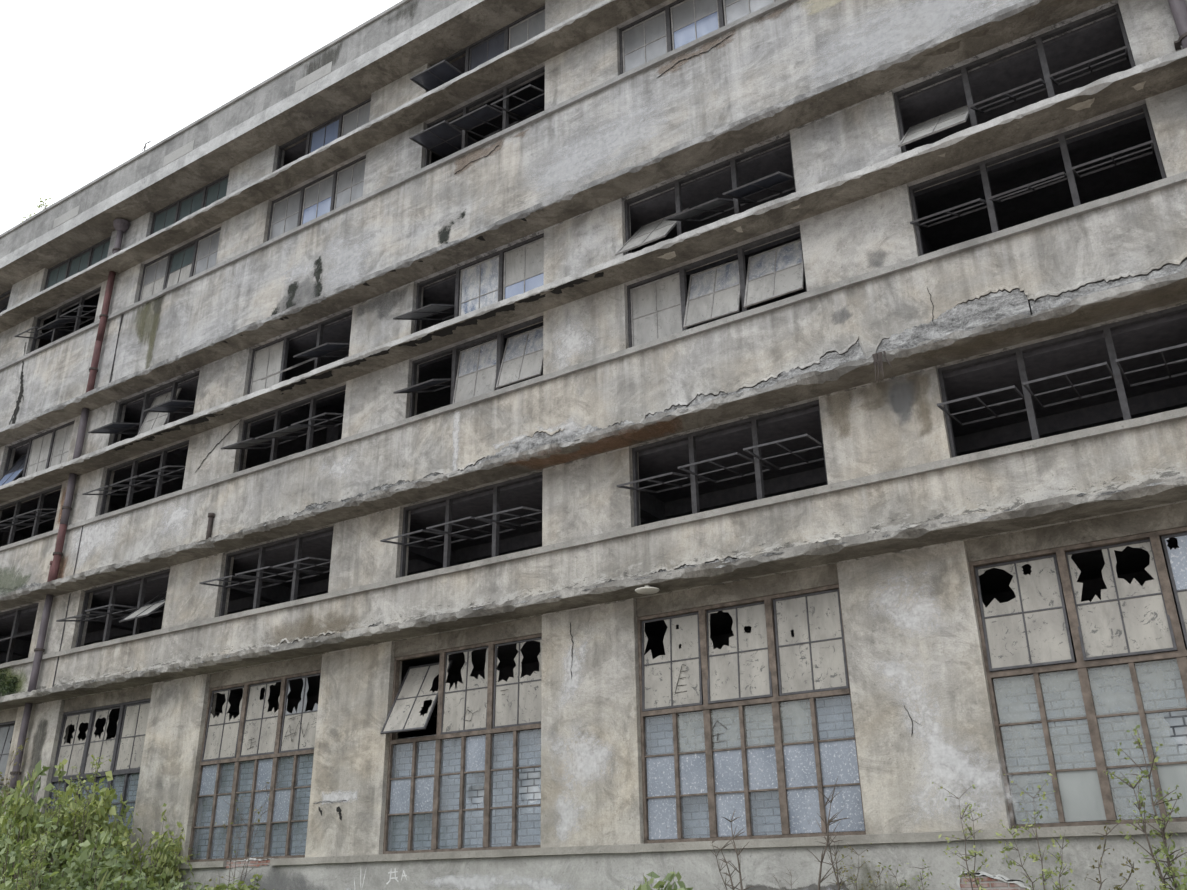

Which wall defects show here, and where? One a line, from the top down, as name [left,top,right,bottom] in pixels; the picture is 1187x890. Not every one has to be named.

peeling [1066,98,1094,111]
water stain [438,212,465,244]
water stain [271,245,364,316]
water stain [137,296,163,369]
crack [9,343,26,425]
spalling [240,252,1187,532]
peeling [114,404,237,451]
spalling [549,552,784,598]
spalling [251,630,341,650]
flaking render [956,871,1032,890]